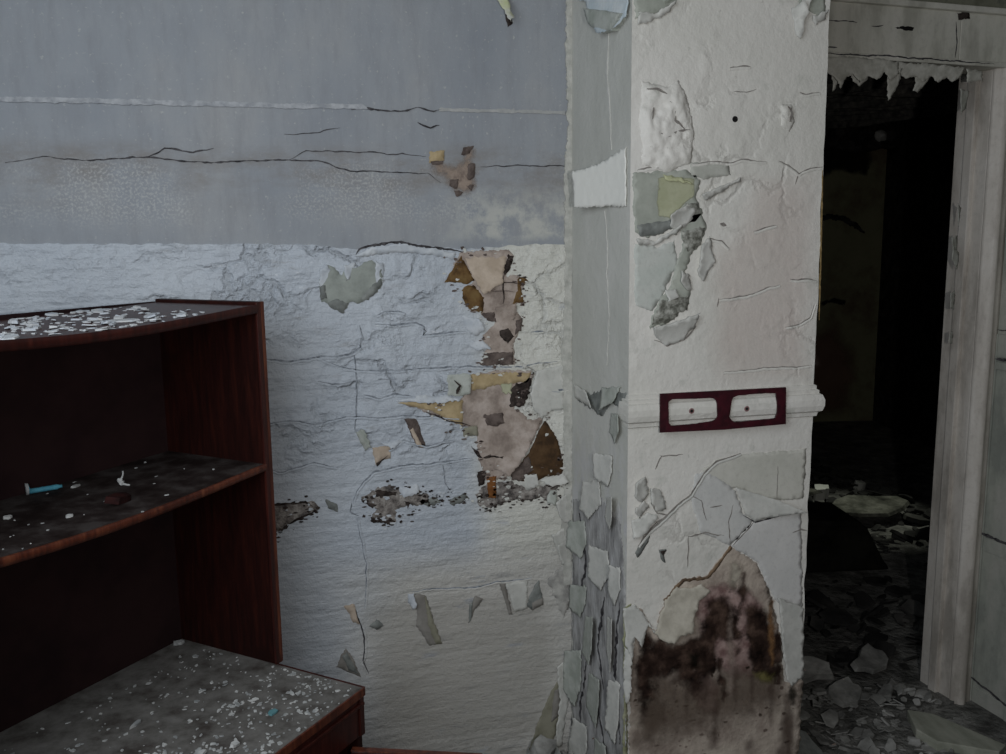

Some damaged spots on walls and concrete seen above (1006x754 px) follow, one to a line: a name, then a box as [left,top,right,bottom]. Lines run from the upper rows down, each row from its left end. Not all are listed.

peeling [827,12,983,114]
crack [351,107,439,129]
crack [5,128,441,183]
crack [488,161,562,169]
peeling [571,0,741,365]
crack [355,241,463,260]
peeling [319,260,385,313]
flaking render [275,495,338,543]
crack [267,311,558,675]
flaking render [356,246,808,754]
peeling [336,649,361,677]
water stain [637,573,796,732]